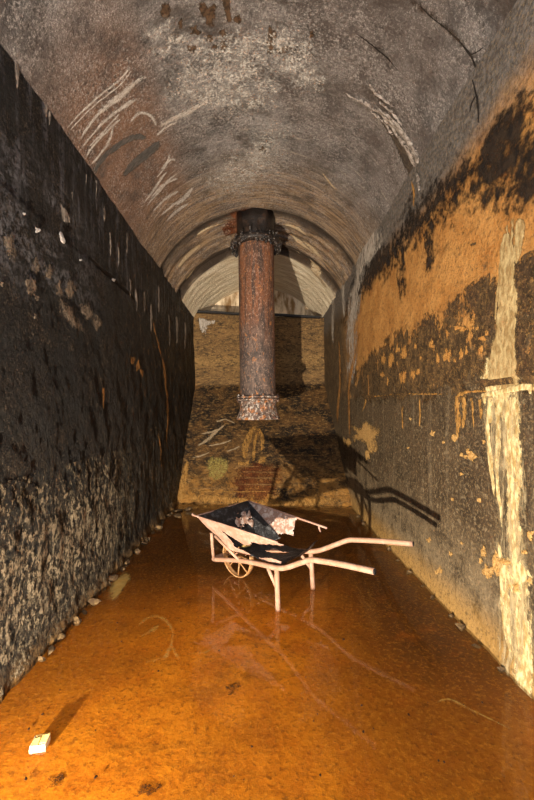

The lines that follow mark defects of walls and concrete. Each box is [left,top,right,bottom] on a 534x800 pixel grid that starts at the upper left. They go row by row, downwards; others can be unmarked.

water stain [143,154,193,221]
water stain [68,0,325,194]
crack [358,35,398,71]
flaking render [346,80,421,192]
crack [422,8,482,123]
water stain [130,280,186,346]
water stain [331,229,387,381]
rust [153,323,169,467]
water stain [480,219,534,699]